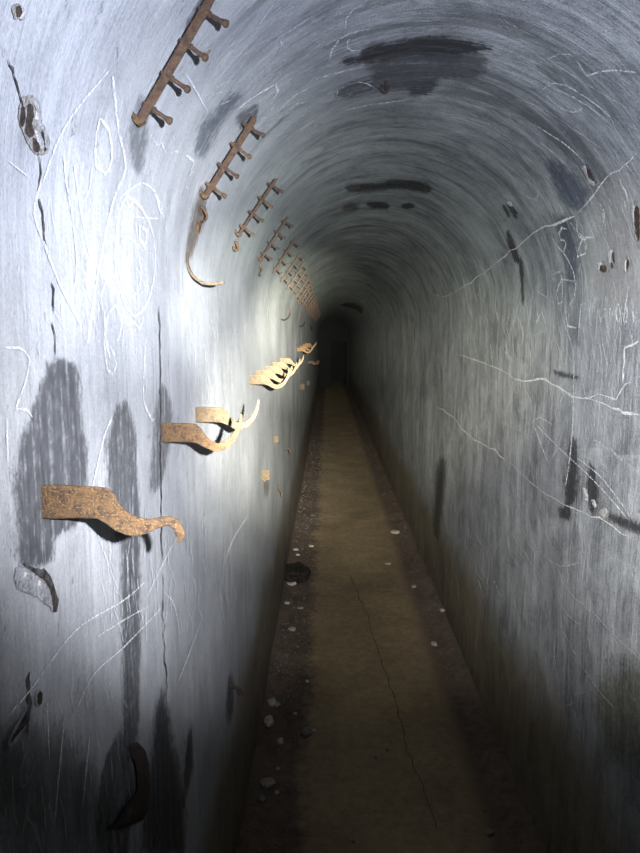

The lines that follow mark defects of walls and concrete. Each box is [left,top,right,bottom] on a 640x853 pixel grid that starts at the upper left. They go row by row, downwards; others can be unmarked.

leakage [336,34,492,97]
flaking render [18,95,50,155]
leakage [345,179,431,193]
crack [432,153,637,297]
flaking render [582,164,596,186]
crack [458,340,639,415]
leakage [13,359,88,567]
leakage [106,403,140,517]
crack [159,313,168,699]
leakage [559,438,598,520]
flaking render [14,567,57,612]
leakage [98,532,141,853]